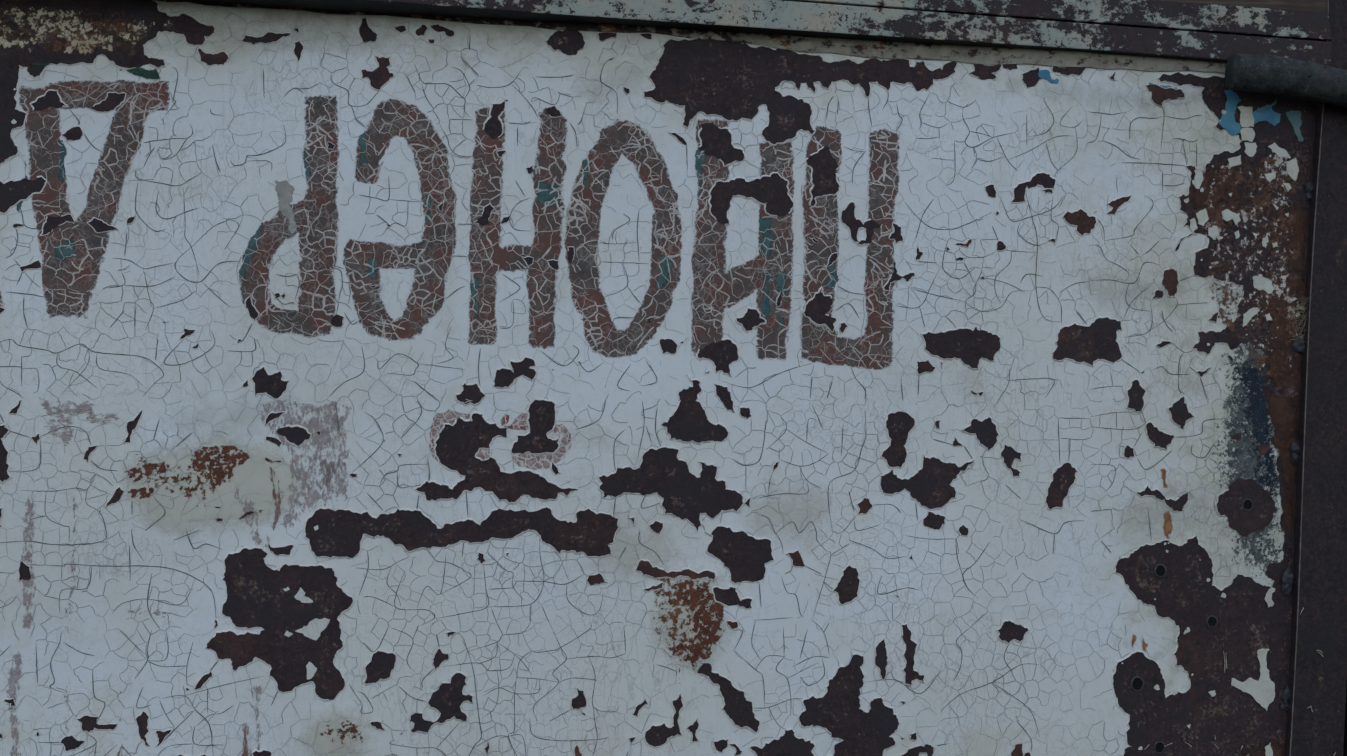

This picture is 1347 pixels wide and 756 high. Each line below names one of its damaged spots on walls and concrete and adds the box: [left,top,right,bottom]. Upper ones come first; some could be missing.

crack [252,39,293,93]
peeling [623,33,1086,291]
rust [1193,165,1240,221]
rust [124,445,249,500]
peeling [186,306,806,756]
crack [910,369,987,462]
peeling [1111,71,1317,756]
rust [1265,279,1306,533]
crack [337,489,698,756]
rust [654,578,724,680]
peeling [629,623,936,756]
crack [1101,605,1129,659]